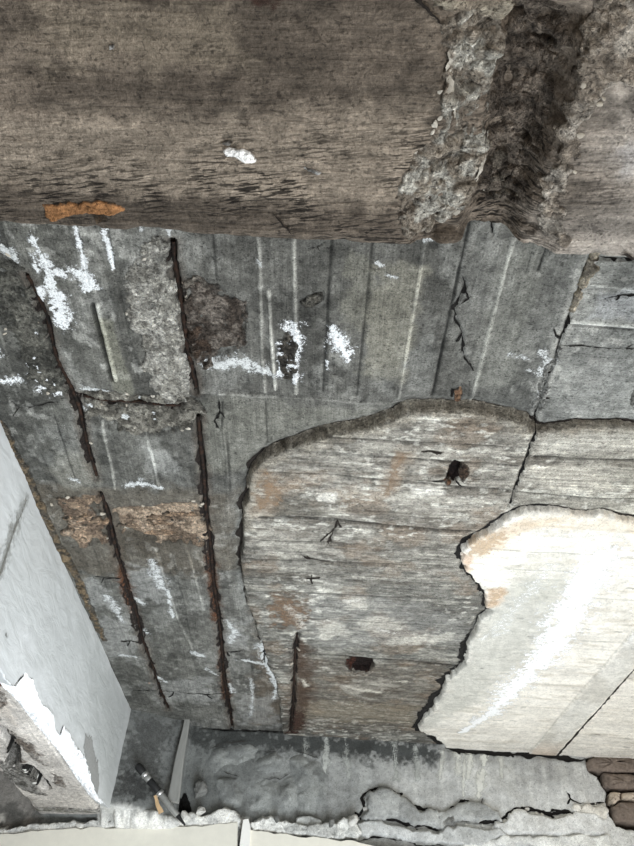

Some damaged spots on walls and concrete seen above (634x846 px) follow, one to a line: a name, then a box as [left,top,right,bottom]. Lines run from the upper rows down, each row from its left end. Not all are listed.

spalling [395,0,634,248]
efflorescence [28,226,100,330]
efflorescence [100,228,115,271]
water stain [0,357,62,396]
crack [214,401,225,428]
efflorescence [201,320,308,385]
efflorescence [324,325,357,370]
spalling [0,235,249,726]
crack [235,252,634,762]
flaking render [0,670,103,814]
crack [205,726,282,734]
flaking render [357,757,634,846]